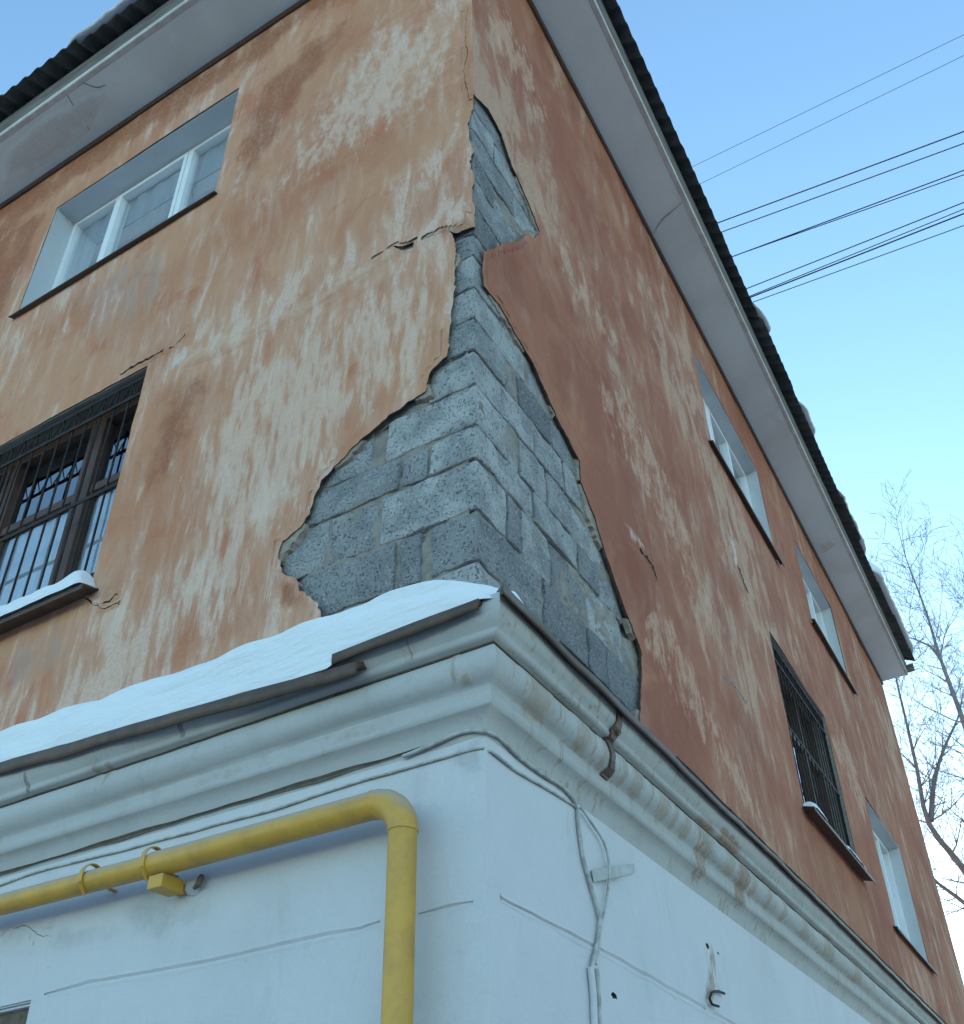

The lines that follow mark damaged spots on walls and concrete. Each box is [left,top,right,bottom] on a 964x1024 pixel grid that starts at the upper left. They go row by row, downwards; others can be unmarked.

crack [83,593,120,612]
crack [120,333,189,379]
flaking render [72,99,777,837]
crack [640,547,658,584]
crack [0,640,922,1024]
damp [591,735,865,991]